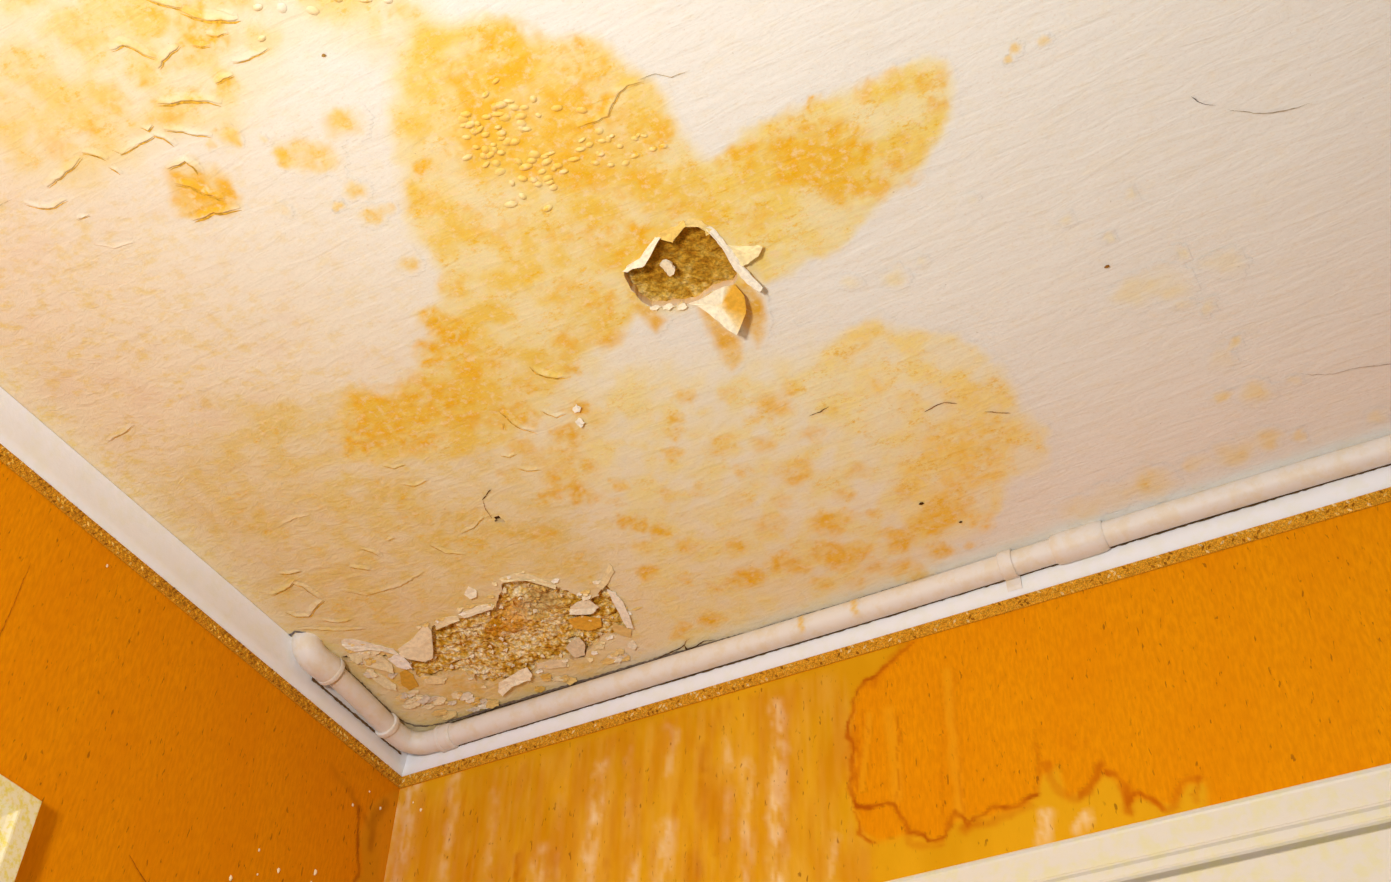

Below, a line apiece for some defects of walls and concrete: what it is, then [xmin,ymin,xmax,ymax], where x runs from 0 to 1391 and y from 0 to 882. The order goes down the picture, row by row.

peeling [107,0,240,69]
peeling [155,45,268,107]
peeling [24,123,242,222]
spalling [622,219,763,335]
leakage [0,0,1059,732]
flaking render [269,564,643,720]
leakage [327,638,1219,882]